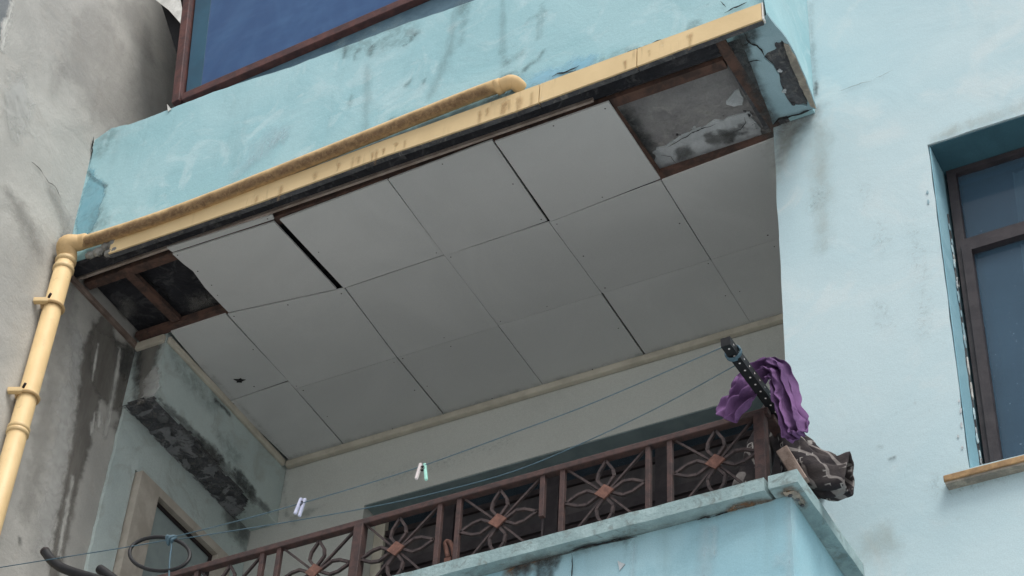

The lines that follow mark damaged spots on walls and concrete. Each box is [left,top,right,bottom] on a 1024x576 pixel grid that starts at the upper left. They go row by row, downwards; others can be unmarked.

leakage [73,43,719,277]
flaking render [652,88,764,169]
leakage [704,131,743,143]
spalling [765,41,816,109]
leakage [50,317,135,576]
spalling [124,344,268,517]